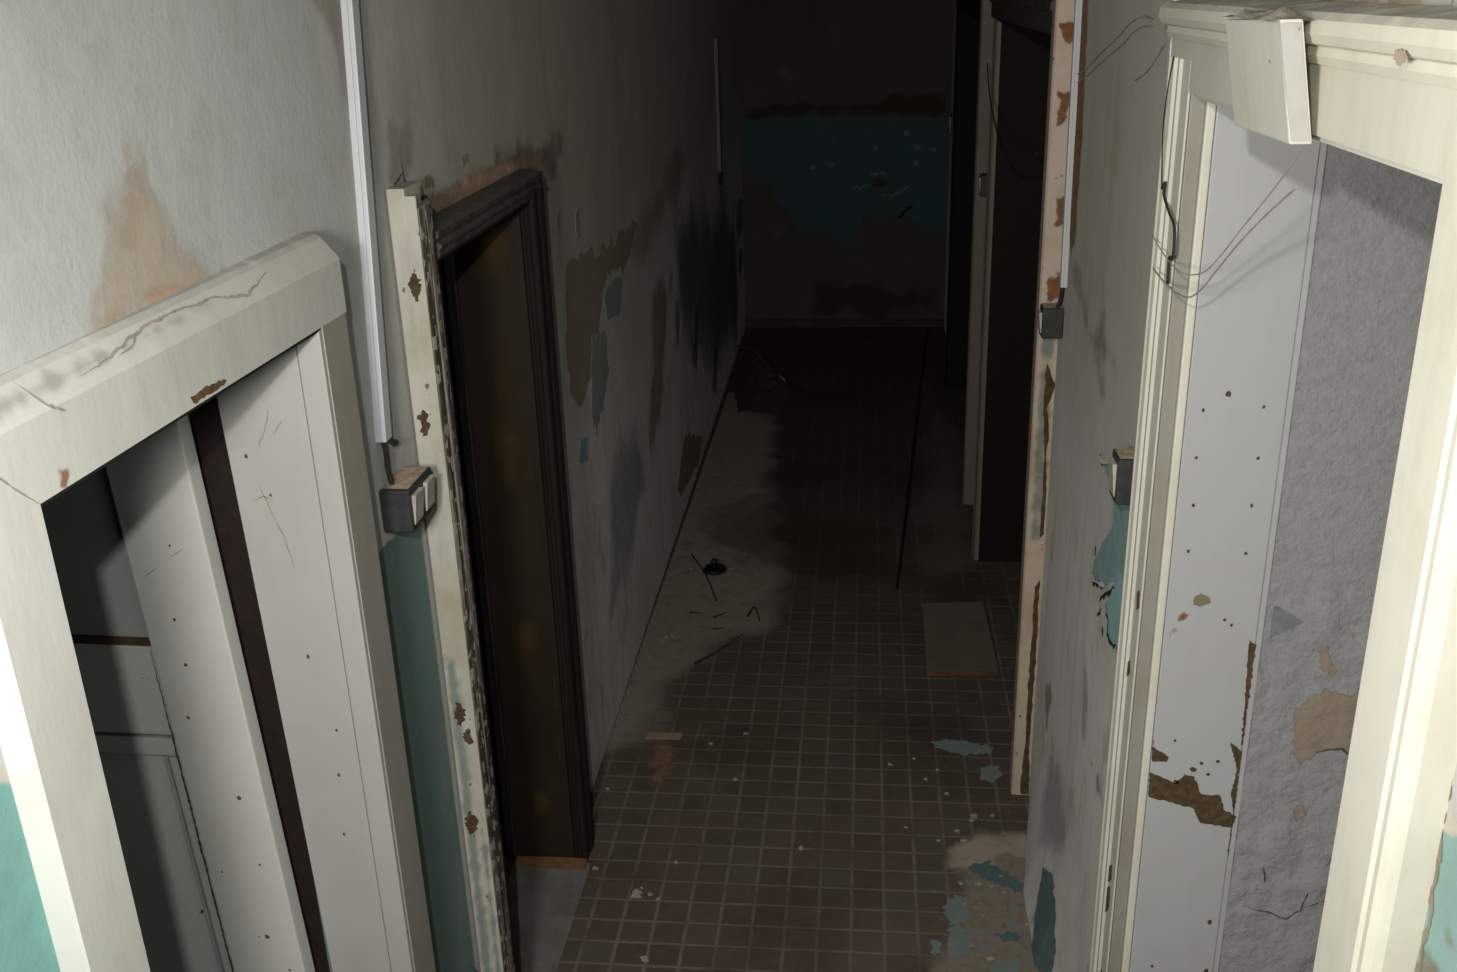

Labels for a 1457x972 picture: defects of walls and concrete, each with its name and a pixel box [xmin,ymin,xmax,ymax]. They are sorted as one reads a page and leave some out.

water stain [102,172,204,319]
crack [0,272,267,411]
flaking render [556,203,638,463]
crack [0,478,39,504]
flaking render [677,432,702,497]
peeling [1088,454,1130,651]
peeling [1148,606,1304,855]
peeling [1291,645,1360,764]